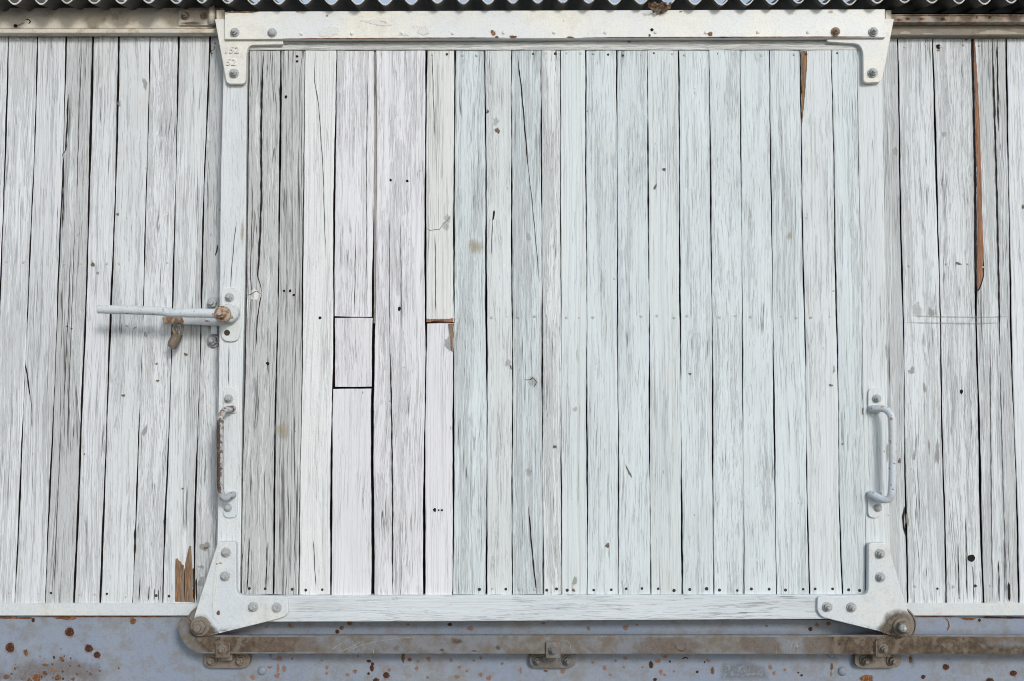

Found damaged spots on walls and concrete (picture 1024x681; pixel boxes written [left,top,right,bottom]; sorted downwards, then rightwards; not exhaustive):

crack [528,507,537,594]
corrosion [0,616,171,637]
corrosion [4,643,101,681]